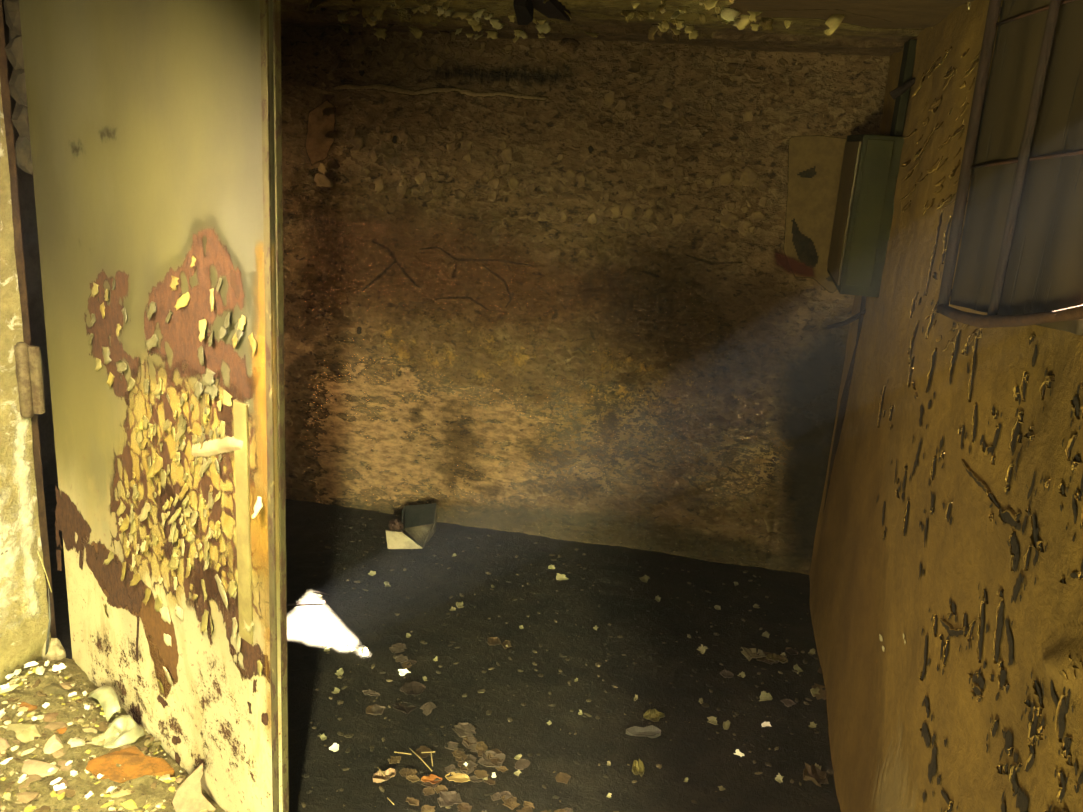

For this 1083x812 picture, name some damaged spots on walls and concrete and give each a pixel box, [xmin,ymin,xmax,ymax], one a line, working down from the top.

peeling [307,0,551,47]
peeling [620,0,792,42]
peeling [824,14,845,36]
rust [55,228,271,782]
peeling [110,361,263,619]